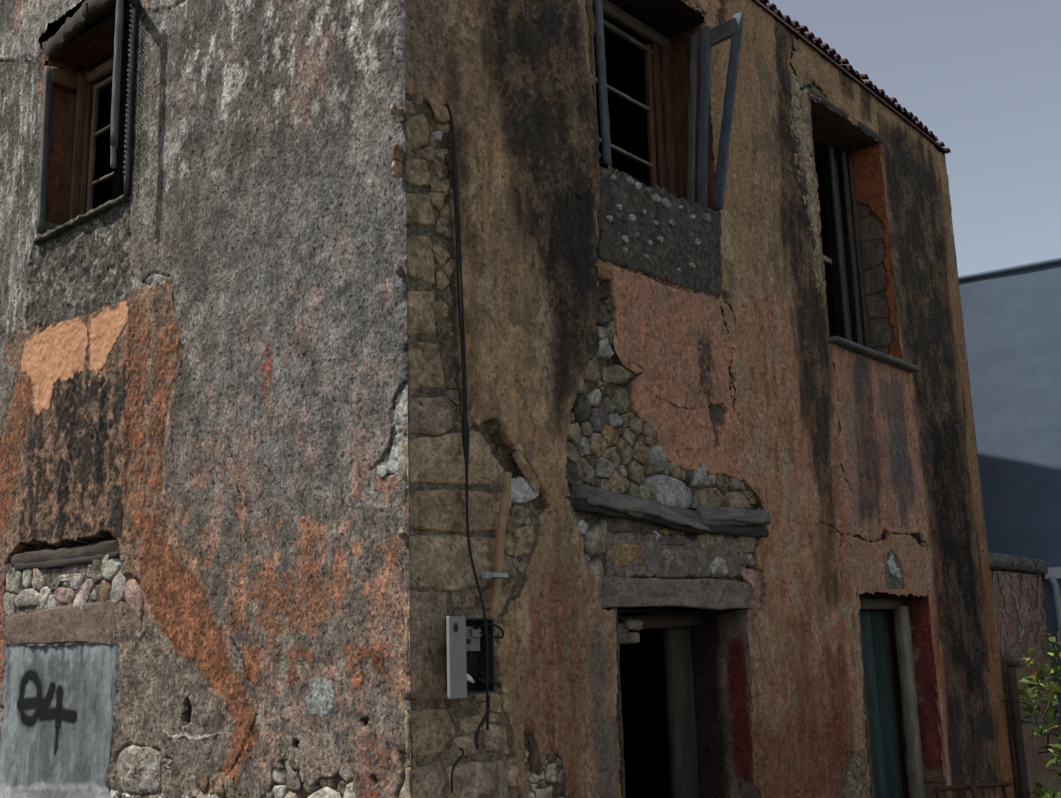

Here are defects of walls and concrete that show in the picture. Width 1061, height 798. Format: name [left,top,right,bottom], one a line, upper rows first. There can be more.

damp [483,0,599,420]
peeling [21,301,129,415]
damp [19,357,133,549]
flaking render [377,92,565,798]
flaking render [565,259,768,619]
damp [775,25,837,603]
damp [842,73,1000,798]
flaking render [3,555,148,636]
crack [822,522,928,578]
flaking render [187,771,246,798]
flaking render [263,760,356,798]